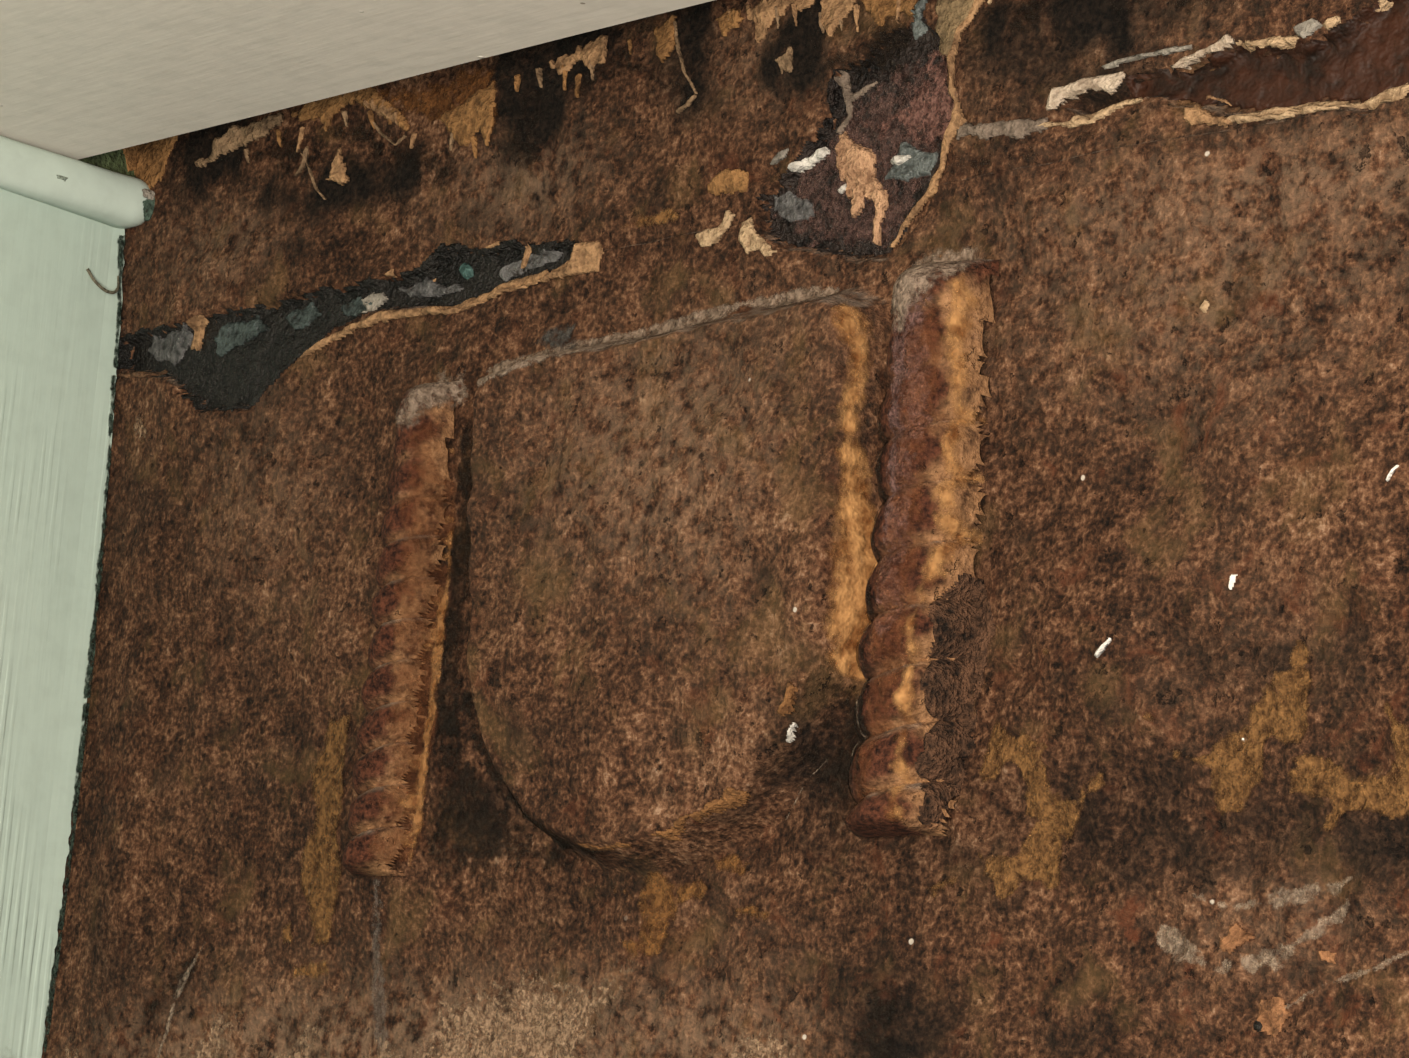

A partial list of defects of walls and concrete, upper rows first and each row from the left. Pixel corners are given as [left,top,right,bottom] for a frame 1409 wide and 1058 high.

flaking render [514,34,608,98]
flaking render [653,15,698,114]
flaking render [1038,0,1409,129]
flaking render [134,135,178,221]
flaking render [194,87,417,200]
flaking render [449,133,478,159]
flaking render [637,209,678,227]
flaking render [695,0,992,257]
rust [927,280,980,581]
flaking render [44,235,604,1052]
rust [399,519,454,862]
rust [894,617,914,734]